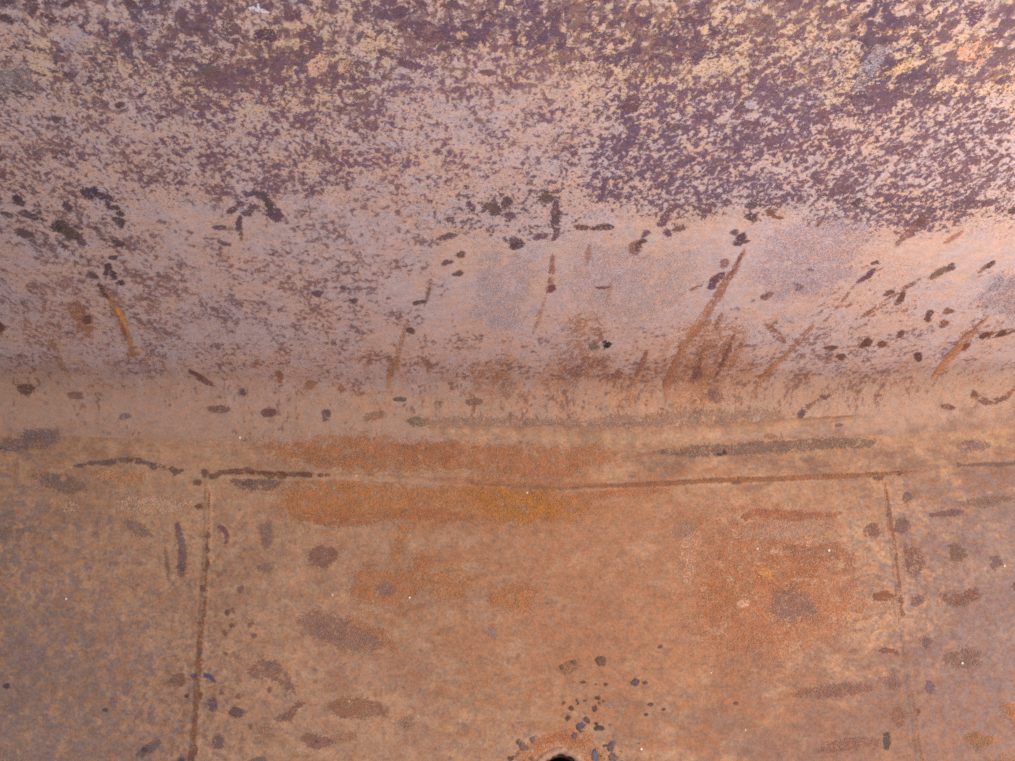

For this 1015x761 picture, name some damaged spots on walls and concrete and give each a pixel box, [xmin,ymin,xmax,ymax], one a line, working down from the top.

rust [97,283,137,360]
rust [387,319,417,402]
rust [441,251,466,277]
rust [532,253,556,334]
rust [554,282,614,403]
rust [657,229,751,411]
rust [933,315,1015,379]
rust [260,407,277,417]
rust [796,394,832,419]
rust [219,409,918,562]
rust [661,495,903,676]
rust [508,660,619,761]